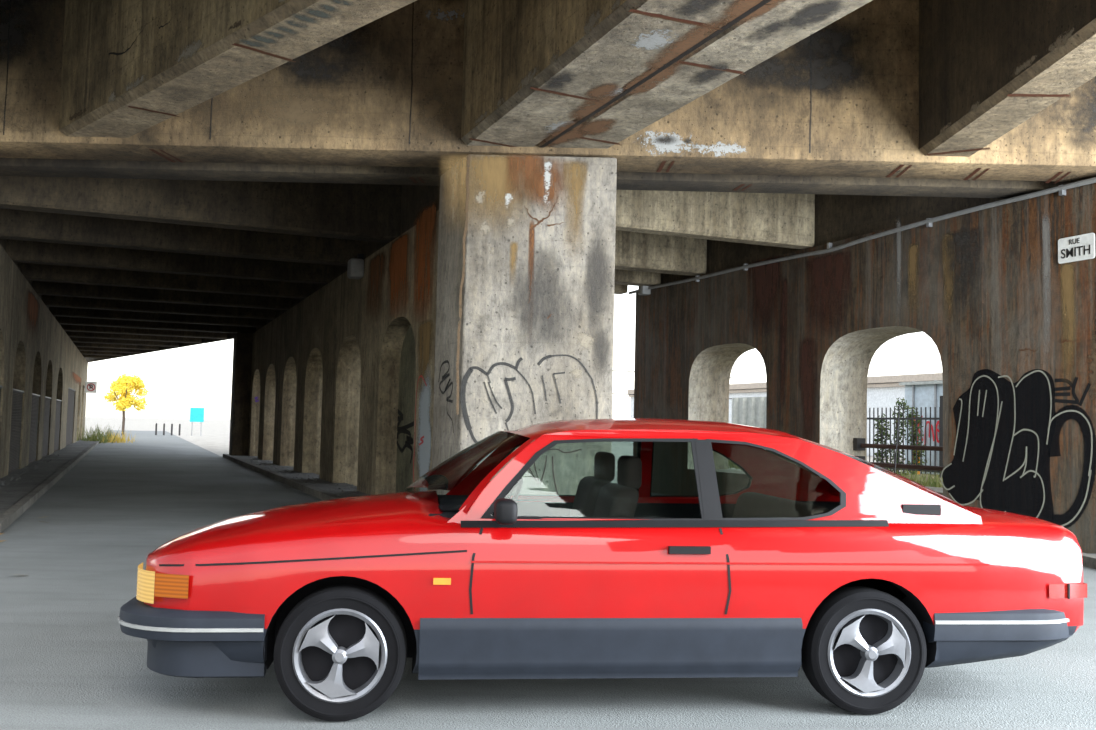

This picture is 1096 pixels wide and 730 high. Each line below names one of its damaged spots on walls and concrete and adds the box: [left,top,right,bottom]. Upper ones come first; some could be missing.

leakage [633,29,676,50]
rust [530,0,786,147]
leakage [680,0,719,15]
leakage [695,65,727,82]
leakage [741,0,871,94]
leakage [1051,77,1096,140]
rust [446,138,587,230]
rust [511,223,559,341]
crack [524,196,564,319]